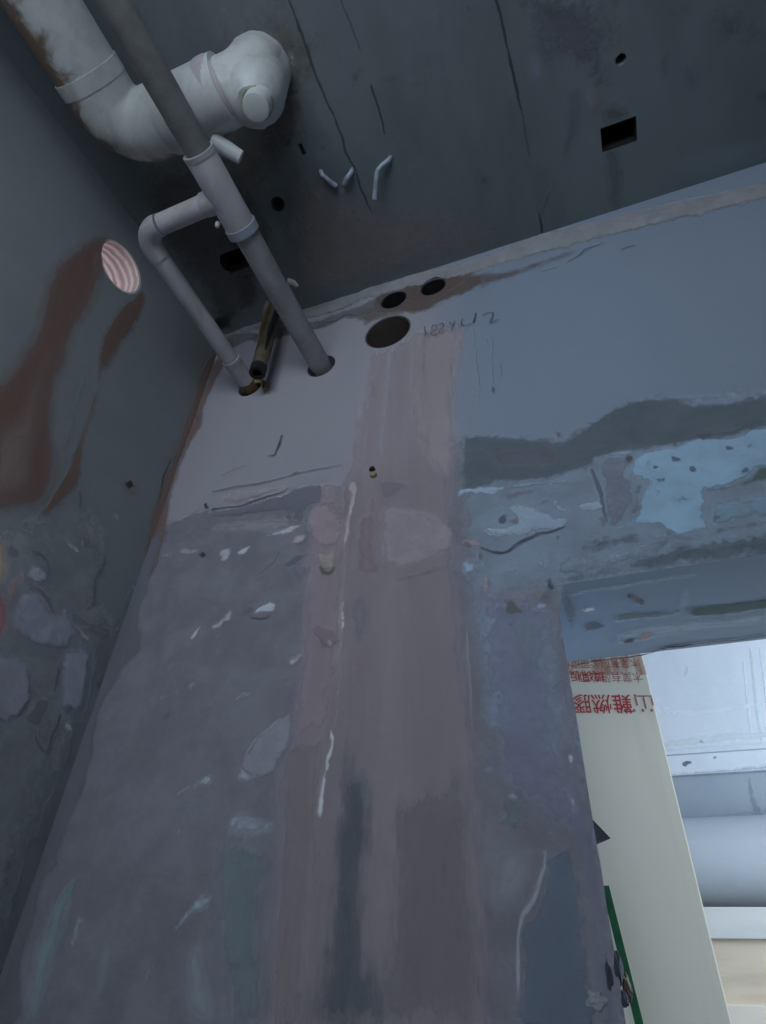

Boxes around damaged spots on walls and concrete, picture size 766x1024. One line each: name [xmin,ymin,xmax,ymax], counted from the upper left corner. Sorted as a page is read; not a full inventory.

crack [288,0,372,213]
crack [370,84,385,135]
crack [495,0,530,159]
corrosion [0,239,106,513]
corrosion [99,292,144,374]
crack [481,526,565,554]
flaking render [0,657,50,740]
flaking render [10,485,343,1024]
flaking render [442,392,766,1024]